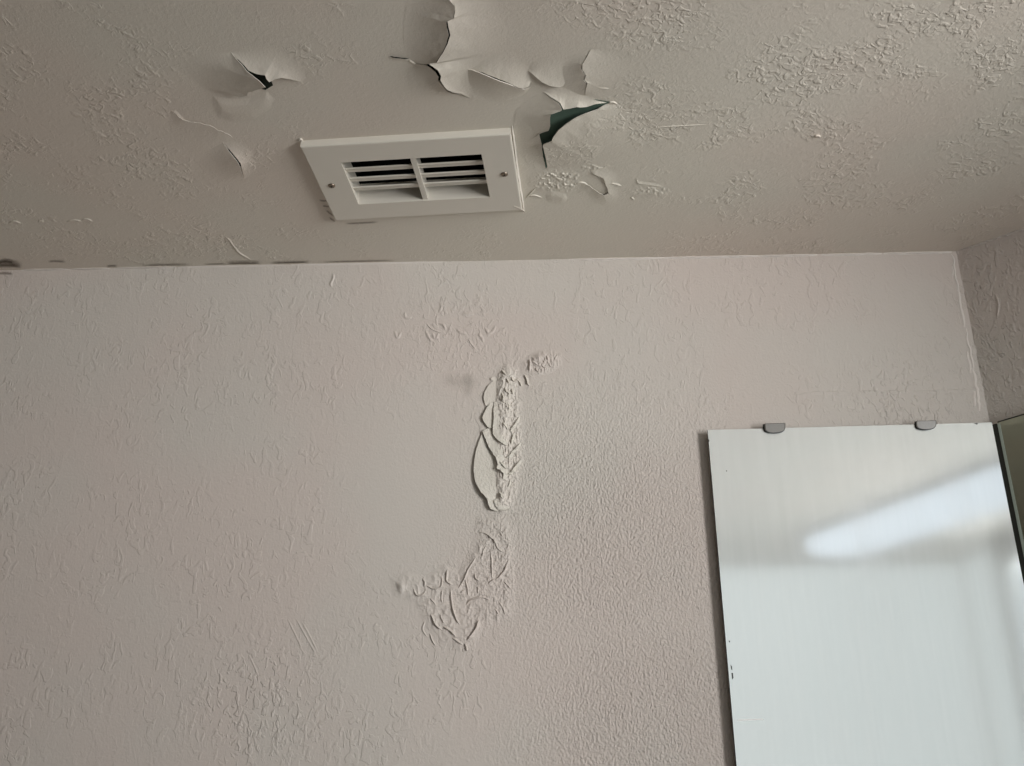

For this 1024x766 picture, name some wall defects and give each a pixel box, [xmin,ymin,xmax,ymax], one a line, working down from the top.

peeling [170,43,308,181]
peeling [403,0,673,205]
peeling [470,363,530,516]